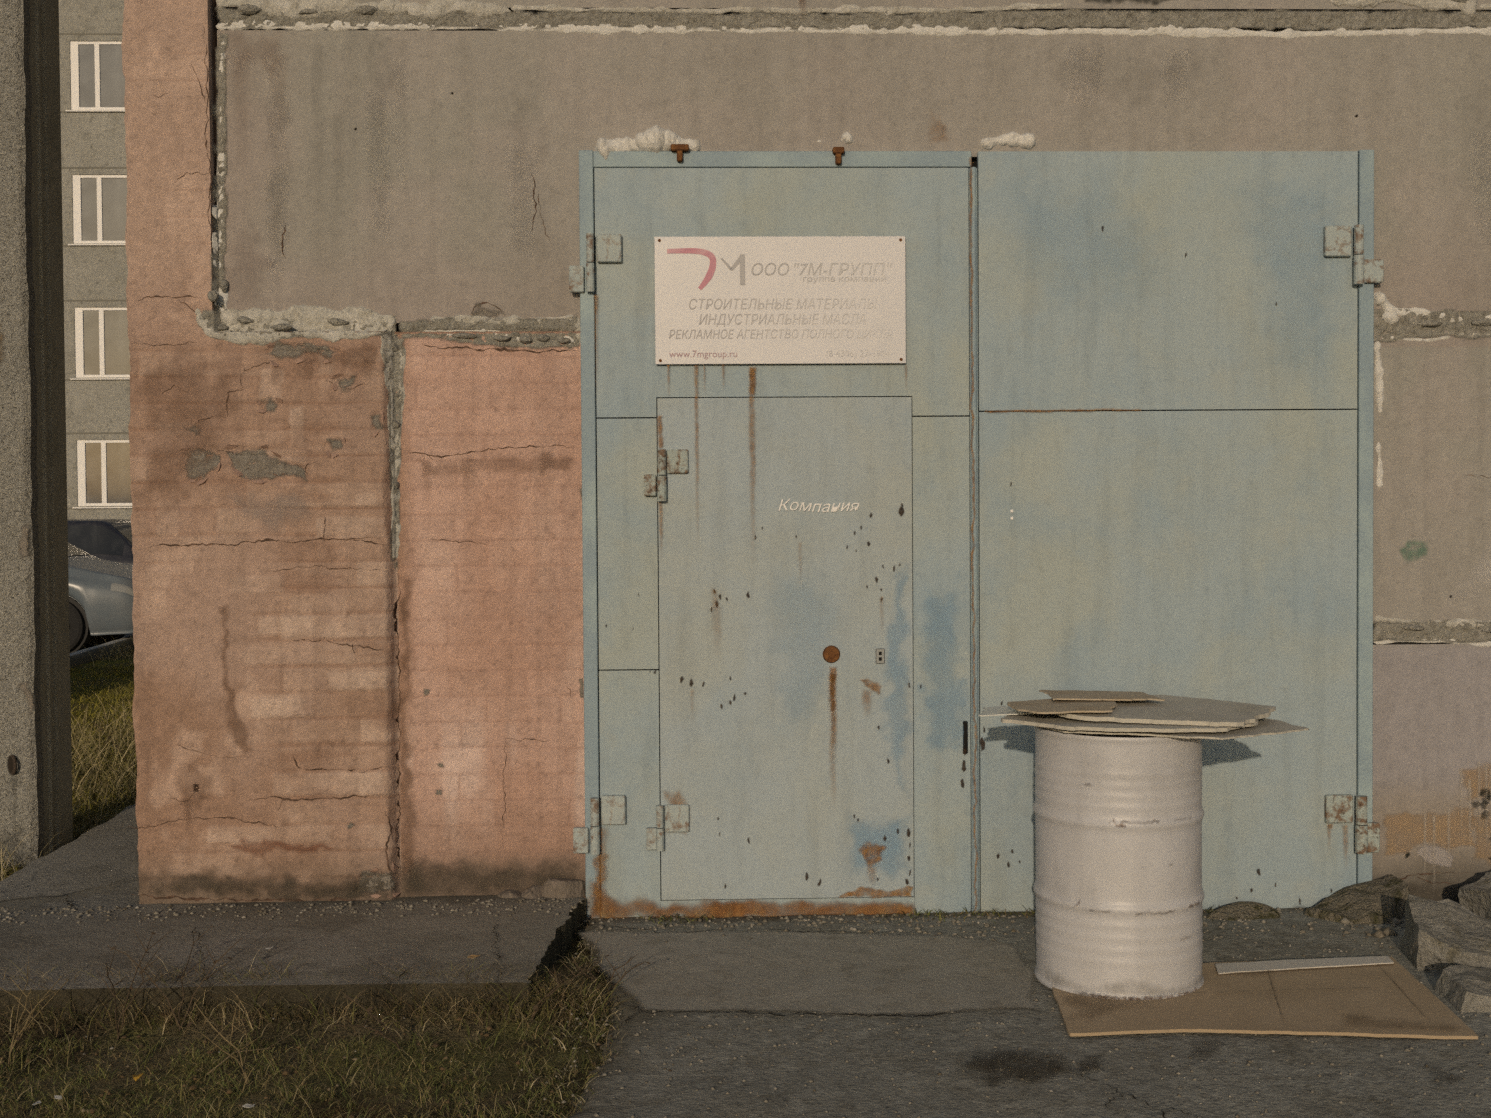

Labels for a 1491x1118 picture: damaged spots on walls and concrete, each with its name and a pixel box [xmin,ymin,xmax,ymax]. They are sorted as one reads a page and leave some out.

spalling [267,341,355,390]
spalling [180,419,305,485]
crack [0,518,401,989]
rust [862,845,885,865]
rust [591,857,913,918]